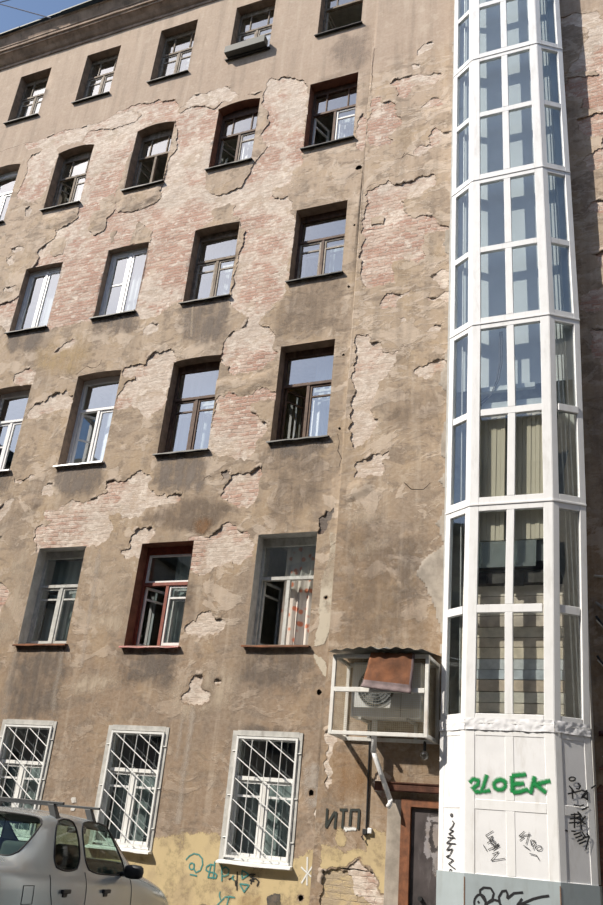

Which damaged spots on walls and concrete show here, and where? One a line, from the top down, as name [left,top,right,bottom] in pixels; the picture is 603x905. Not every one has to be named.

flaking render [561,11,603,172]
flaking render [17,74,310,375]
flaking render [353,173,449,309]
flaking render [0,284,19,332]
flaking render [13,365,36,386]
flaking render [27,389,73,419]
flaking render [114,347,178,419]
flaking render [208,387,276,508]
flaking render [33,470,183,559]
flaking render [188,522,255,576]
flaking render [181,670,222,706]
peeling [95,826,386,905]